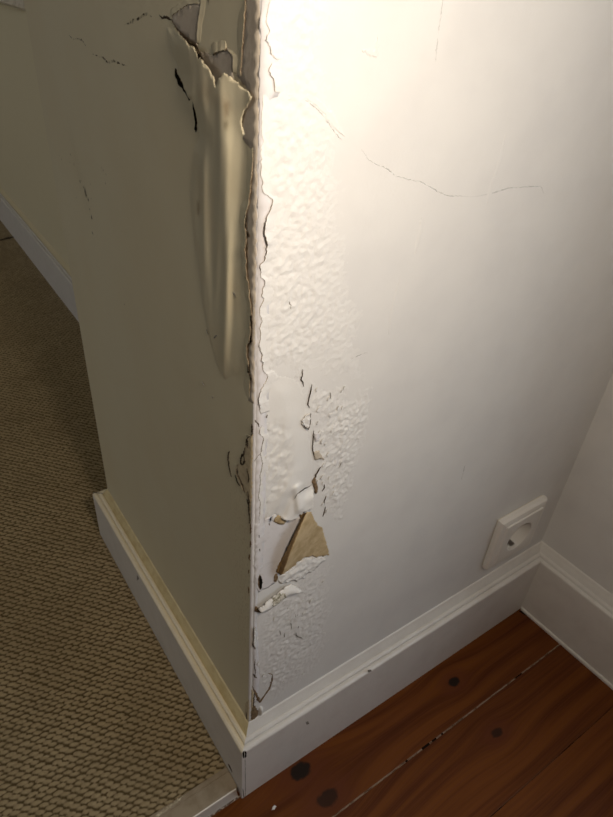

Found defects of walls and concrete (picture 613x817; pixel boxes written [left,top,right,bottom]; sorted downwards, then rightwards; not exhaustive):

flaking render [160,0,329,722]